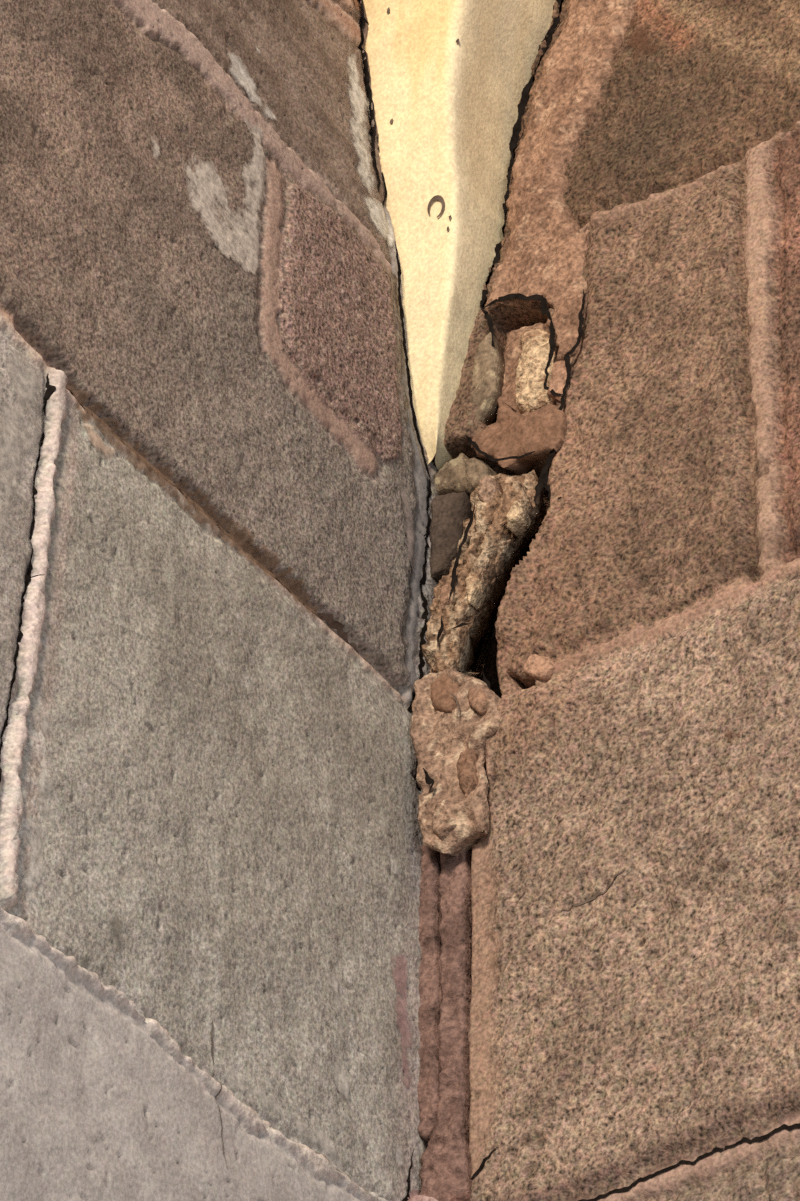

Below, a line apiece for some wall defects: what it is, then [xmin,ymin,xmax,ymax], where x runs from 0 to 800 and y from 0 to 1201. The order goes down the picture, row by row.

leakage [185,54,276,274]
leakage [348,57,394,246]
crack [357,0,387,206]
crack [480,0,585,410]
crack [0,374,94,783]
crack [117,438,358,652]
spalling [410,322,574,856]
crack [465,435,562,501]
crack [555,867,626,913]
crack [402,844,499,1201]
crack [578,1123,800,1201]